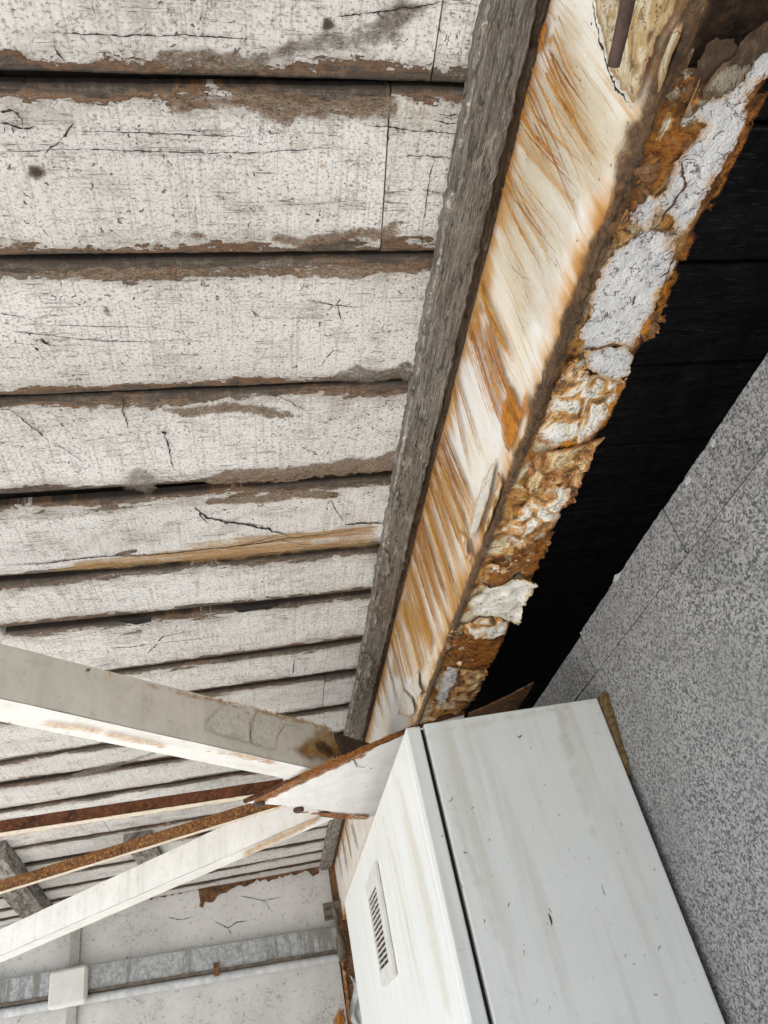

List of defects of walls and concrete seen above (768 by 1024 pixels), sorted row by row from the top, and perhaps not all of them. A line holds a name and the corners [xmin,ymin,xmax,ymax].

leakage [269,0,425,61]
peeling [167,90,397,127]
rust [710,95,766,207]
peeling [37,262,420,281]
rust [243,0,712,808]
crack [9,409,81,461]
crack [0,501,382,566]
rust [73,527,374,569]
peeling [458,458,502,563]
peeling [461,579,538,640]
peeling [436,667,488,705]
rust [150,867,319,908]